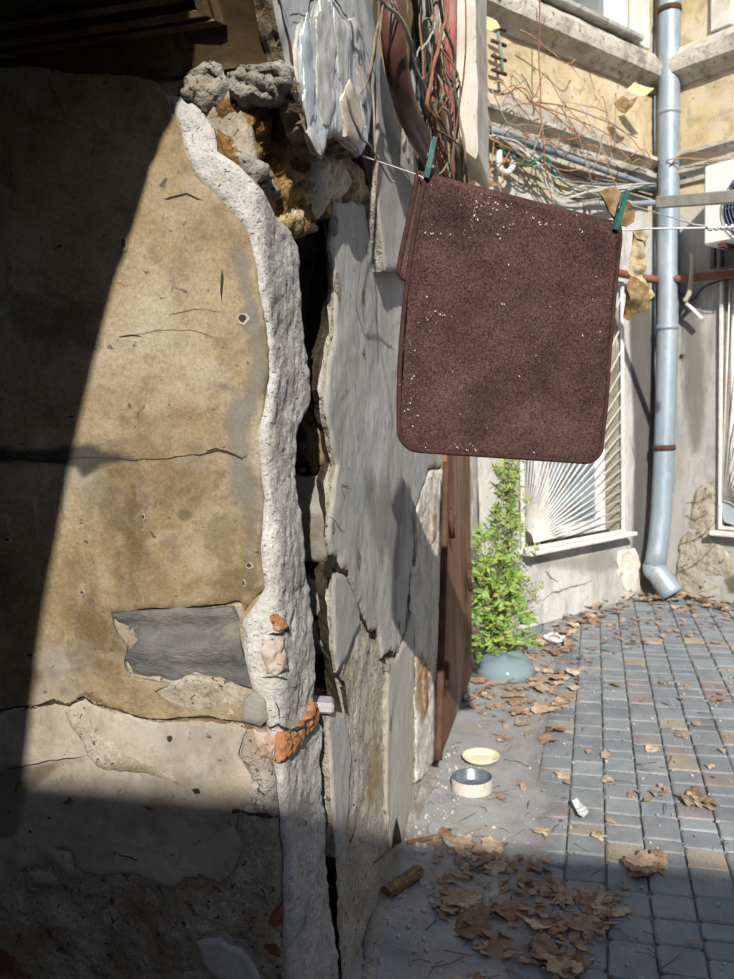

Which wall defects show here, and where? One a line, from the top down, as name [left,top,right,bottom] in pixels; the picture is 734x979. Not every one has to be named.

crack [281,0,363,25]
crack [283,67,308,128]
crack [119,270,224,337]
flaking render [159,0,369,979]
flaking render [674,481,732,596]
crack [0,407,397,858]
flaking render [65,711,192,788]